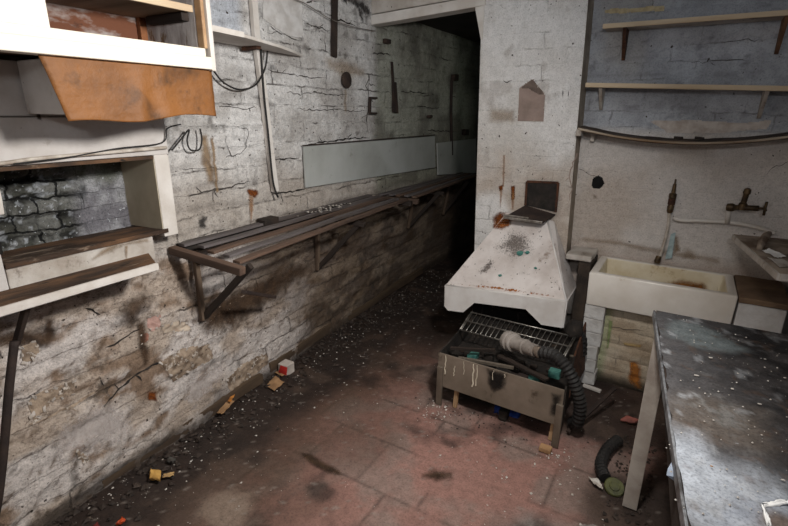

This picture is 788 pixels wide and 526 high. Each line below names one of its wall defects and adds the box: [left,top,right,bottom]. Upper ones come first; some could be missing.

crack [303,0,355,31]
mould [343,0,370,21]
crack [219,102,256,157]
crack [185,167,250,197]
rust [493,212,511,228]
damp [202,267,304,330]
damp [0,320,55,348]
damp [123,296,148,364]
crack [29,361,162,425]
damp [61,409,127,450]